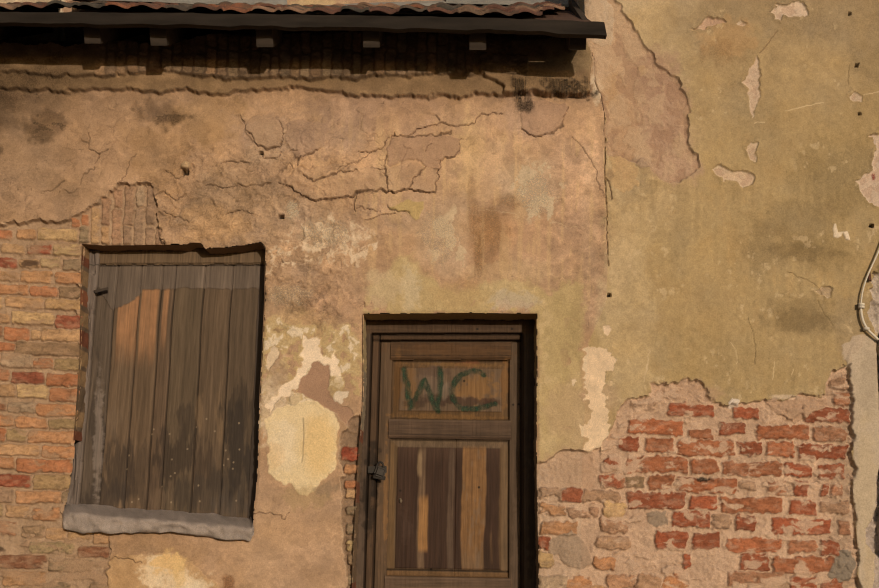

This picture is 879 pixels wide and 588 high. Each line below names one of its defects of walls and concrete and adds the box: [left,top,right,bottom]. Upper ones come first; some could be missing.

spalling [287,0,508,14]
peeling [769,0,809,21]
spalling [540,0,701,183]
peeling [742,55,763,118]
crack [42,131,109,195]
crack [154,170,190,243]
crack [206,112,503,221]
crack [521,52,613,266]
peeling [855,132,879,207]
spalling [0,181,165,588]
spalling [265,334,362,588]
spalling [537,323,879,588]